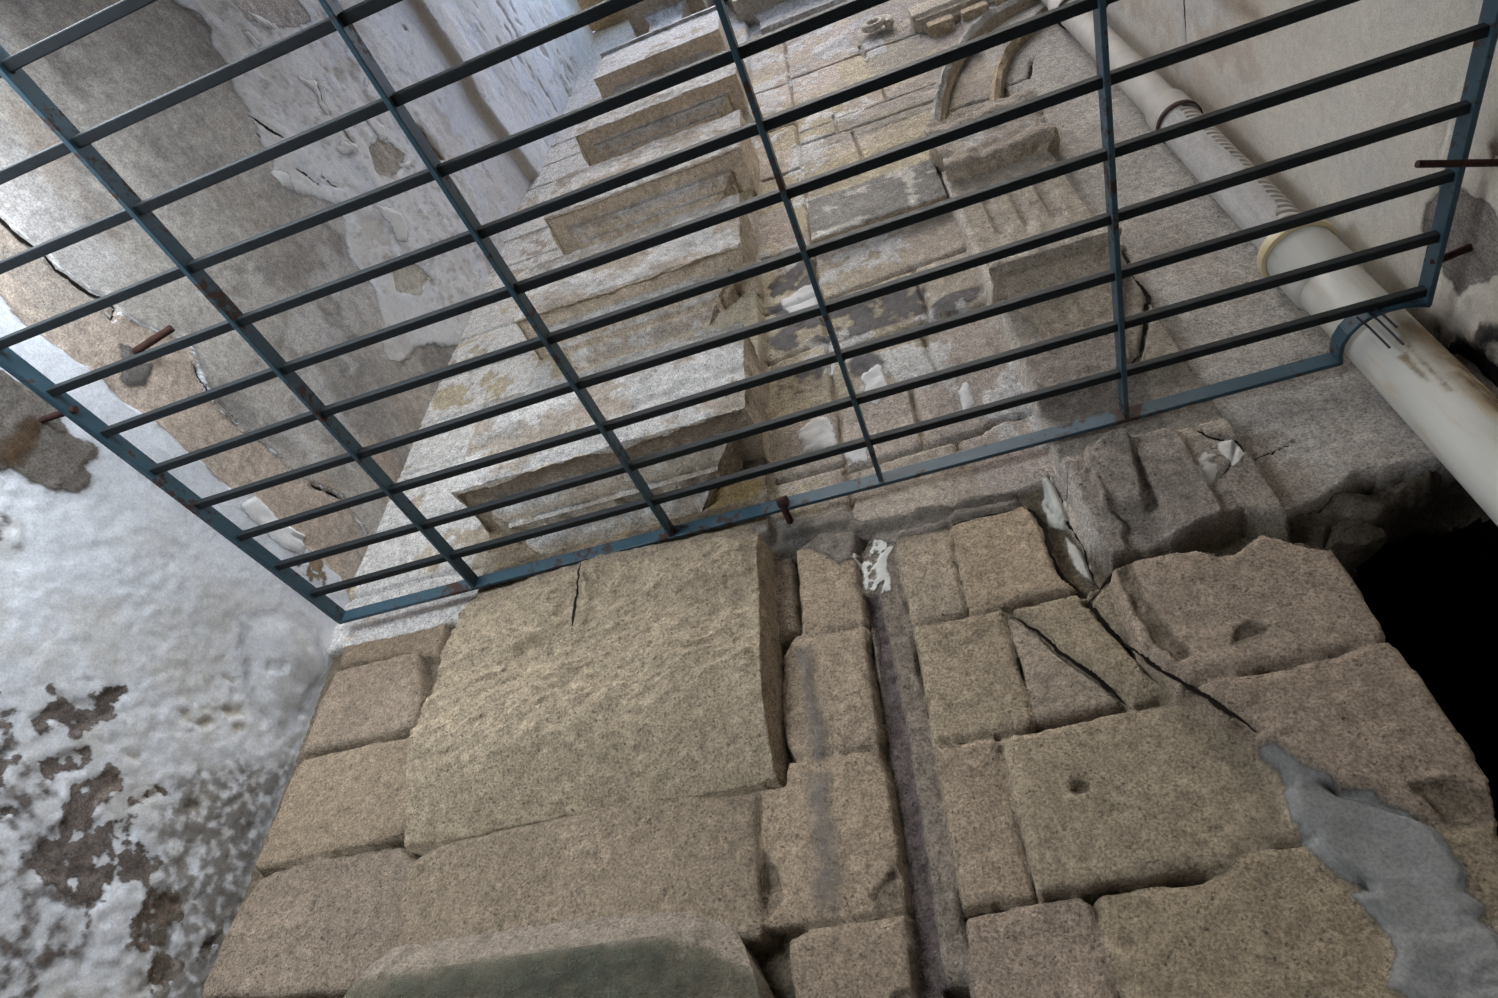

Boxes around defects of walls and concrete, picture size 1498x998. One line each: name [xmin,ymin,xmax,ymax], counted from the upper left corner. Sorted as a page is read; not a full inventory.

flaking render [232,0,310,48]
flaking render [337,117,414,178]
peeling [270,170,293,187]
flaking render [393,264,432,295]
peeling [0,223,368,593]
crack [952,474,1257,733]
peeling [0,683,223,998]